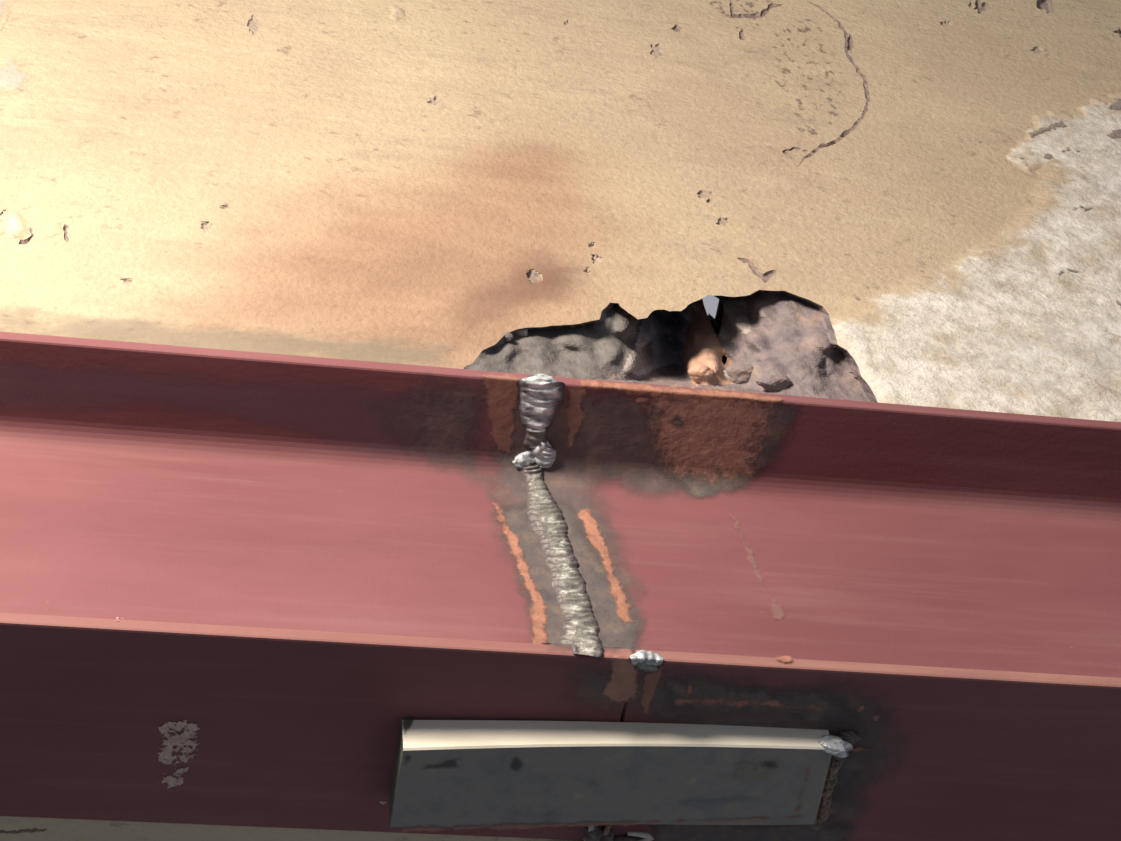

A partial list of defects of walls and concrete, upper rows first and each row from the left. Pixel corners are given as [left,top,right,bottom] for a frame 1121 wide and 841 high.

crack [729,0,870,167]
damp [826,87,1121,422]
spalling [464,290,878,403]
corrosion [483,375,520,453]
corrosion [566,380,783,483]
corrosion [494,504,552,645]
corrosion [578,509,631,623]
corrosion [602,656,663,714]